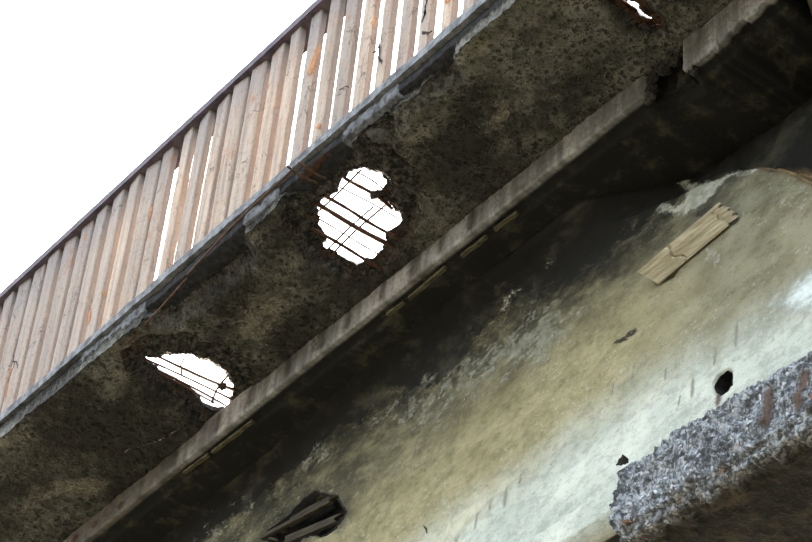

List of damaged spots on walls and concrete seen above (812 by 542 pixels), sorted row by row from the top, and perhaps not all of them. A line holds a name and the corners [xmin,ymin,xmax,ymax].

damp [659,169,757,215]
spalling [311,169,401,271]
spalling [120,168,294,406]
corrosion [760,386,773,428]
corrosion [793,369,812,410]
spalling [260,490,347,542]
damp [438,487,507,542]